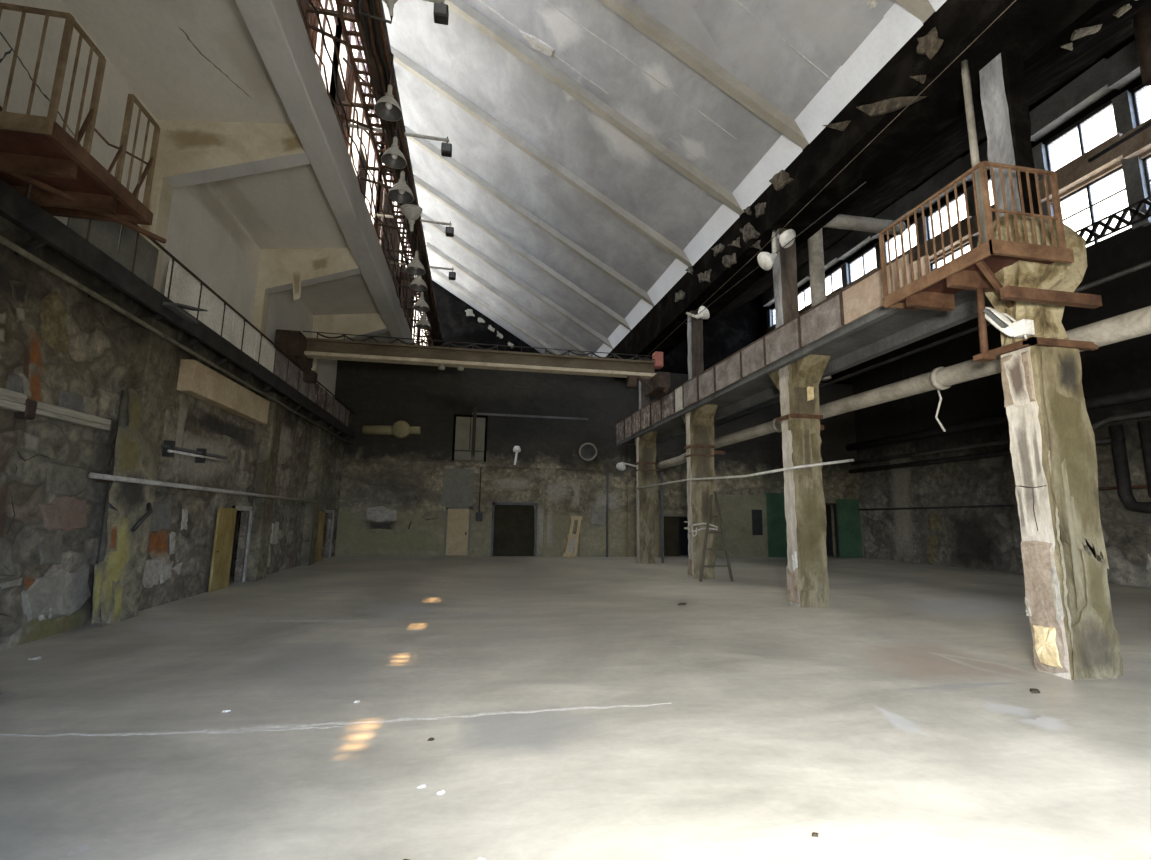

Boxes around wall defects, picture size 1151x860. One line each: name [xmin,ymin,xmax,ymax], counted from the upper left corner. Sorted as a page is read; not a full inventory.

crack [180,28,251,98]
leakage [160,126,237,154]
spalling [1000,349,1036,407]
spalling [1021,540,1069,674]